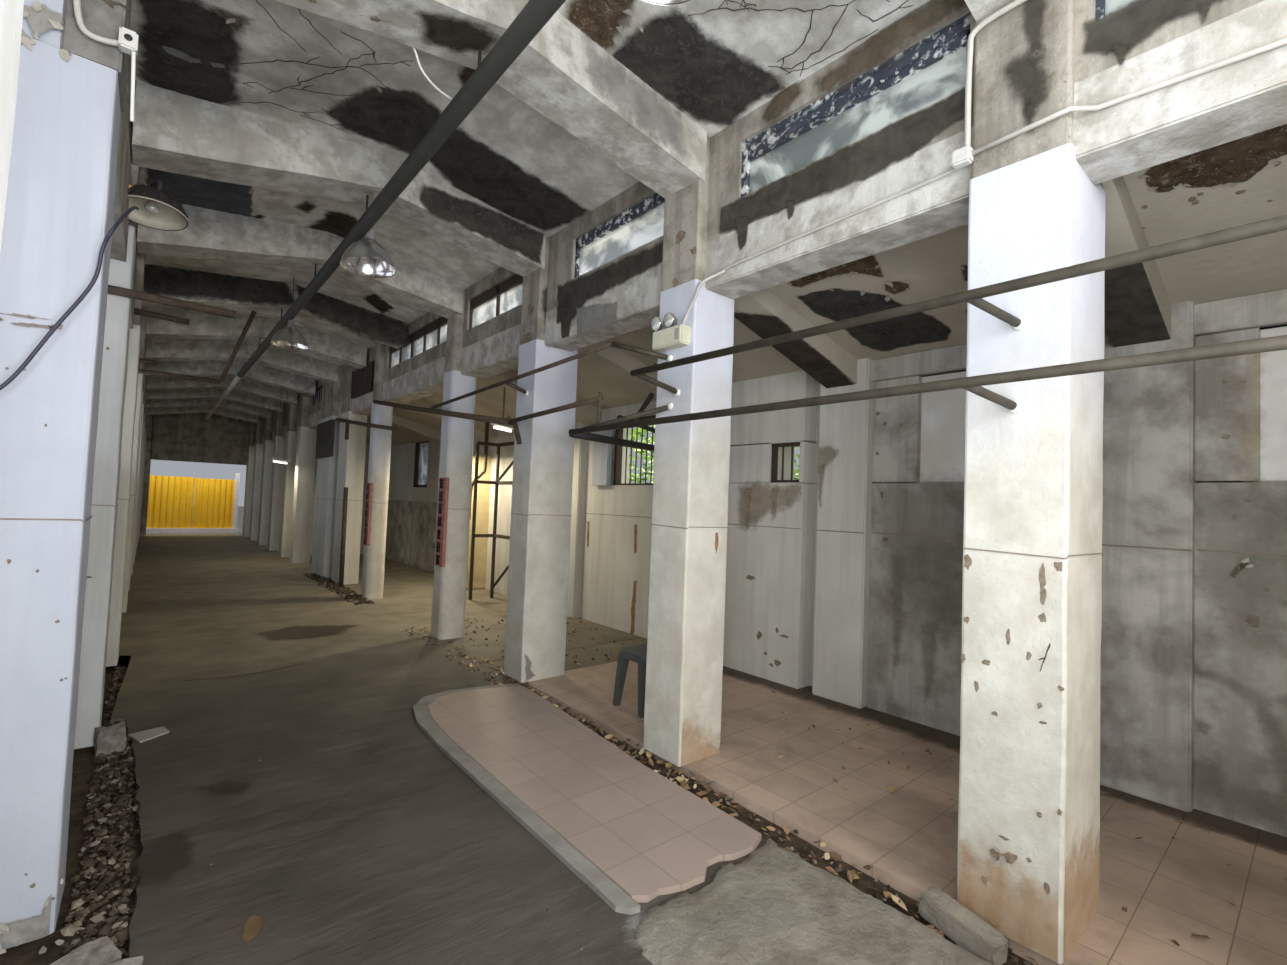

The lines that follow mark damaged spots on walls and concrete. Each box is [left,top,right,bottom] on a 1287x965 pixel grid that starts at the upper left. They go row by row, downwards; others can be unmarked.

peeling [21,1,63,51]
spalling [137,0,241,105]
crack [240,0,410,131]
spalling [567,0,784,126]
crack [688,0,914,76]
water stain [1006,0,1047,125]
spalling [146,168,254,217]
spalling [326,87,441,154]
spalling [429,129,589,231]
peeling [1137,124,1287,209]
spalling [787,255,951,351]
spalling [1038,562,1063,622]